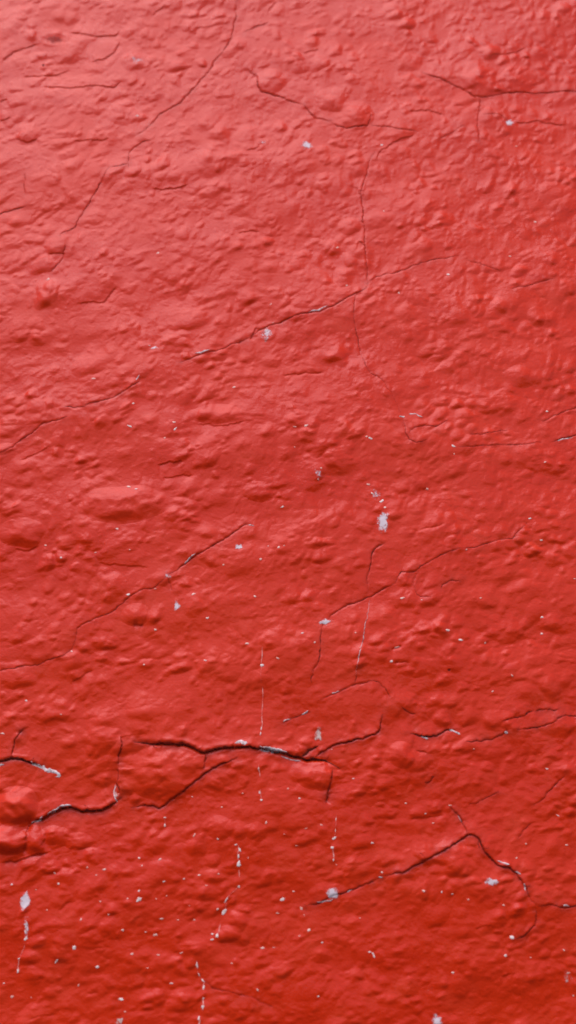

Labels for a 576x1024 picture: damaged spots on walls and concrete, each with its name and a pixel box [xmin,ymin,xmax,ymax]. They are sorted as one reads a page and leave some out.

crack [29,533,573,826]
crack [0,731,61,778]
crack [305,792,576,939]